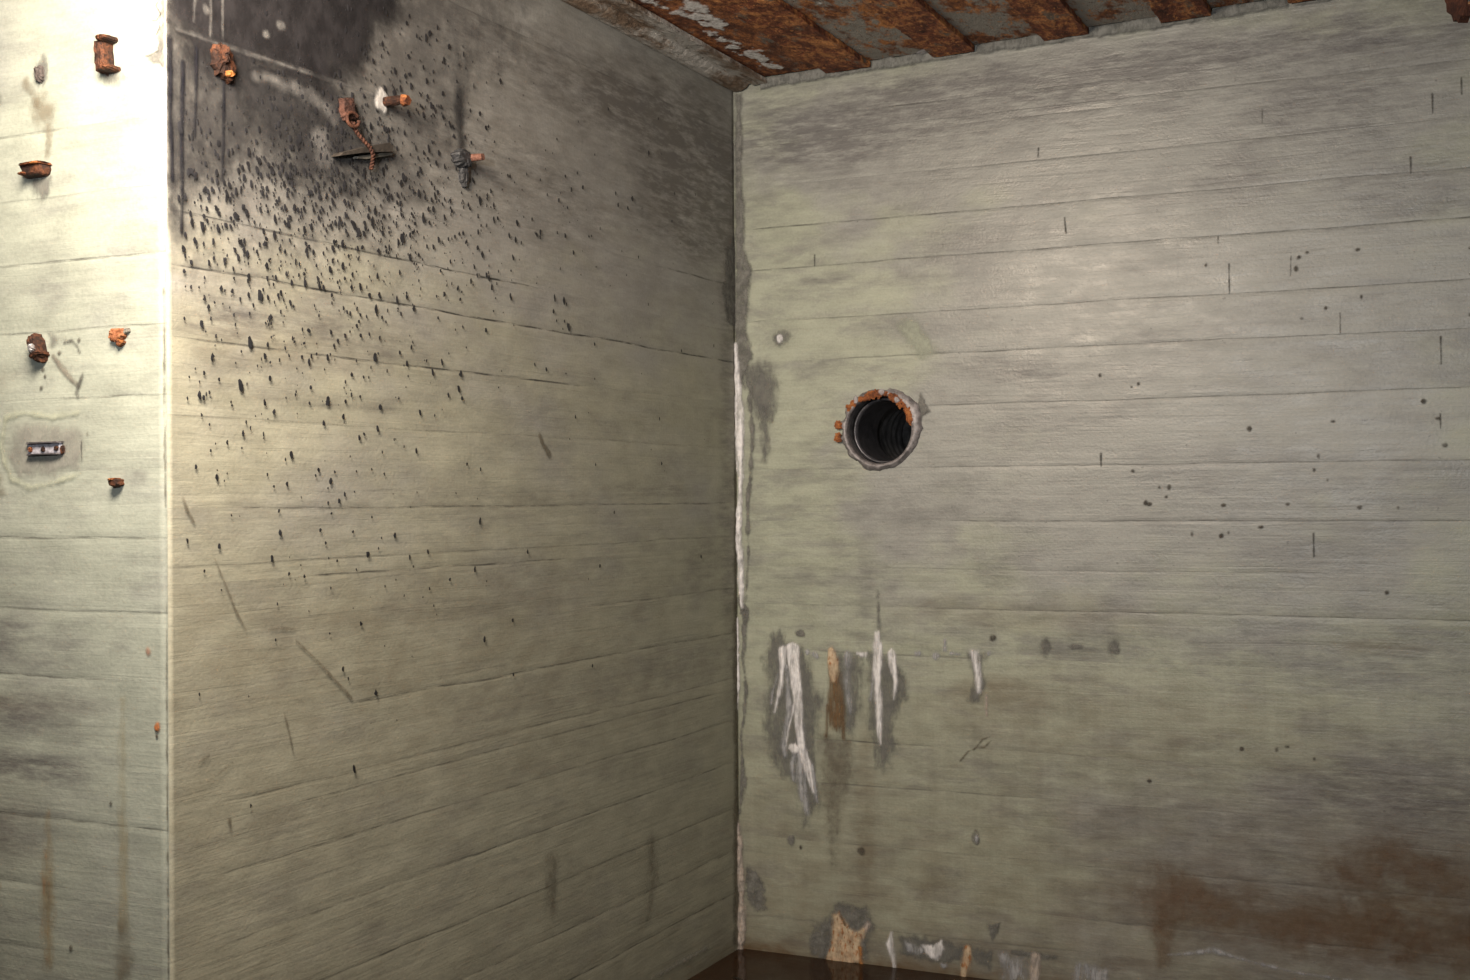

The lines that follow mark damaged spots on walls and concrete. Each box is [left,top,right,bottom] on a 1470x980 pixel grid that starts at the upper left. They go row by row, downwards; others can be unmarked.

water stain [745,367,775,456]
rust [834,389,913,442]
water stain [765,632,822,822]
water stain [837,632,906,766]
water stain [915,639,989,716]
spalling [810,903,874,964]